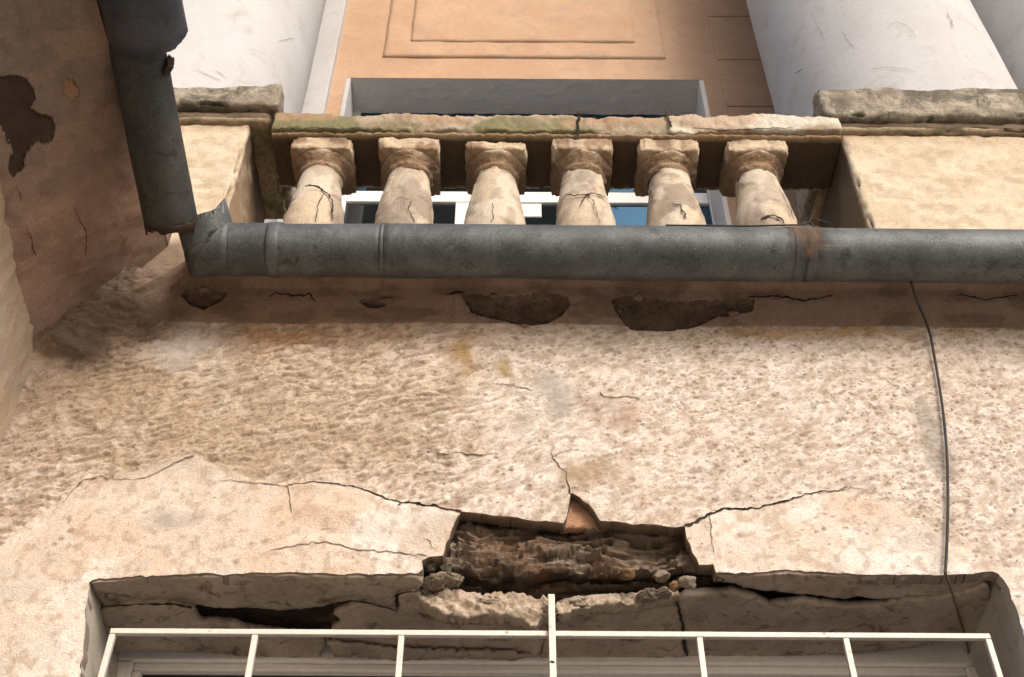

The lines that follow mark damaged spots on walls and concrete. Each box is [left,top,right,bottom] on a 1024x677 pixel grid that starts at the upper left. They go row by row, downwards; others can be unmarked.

peeling [0,75,55,177]
crack [306,184,334,222]
crack [566,193,608,222]
spalling [180,285,226,309]
spalling [462,291,569,328]
spalling [612,293,755,331]
crack [57,455,194,503]
crack [219,479,462,513]
crack [684,487,864,553]
crack [271,528,432,556]
spalling [417,500,719,631]
crack [100,591,418,621]